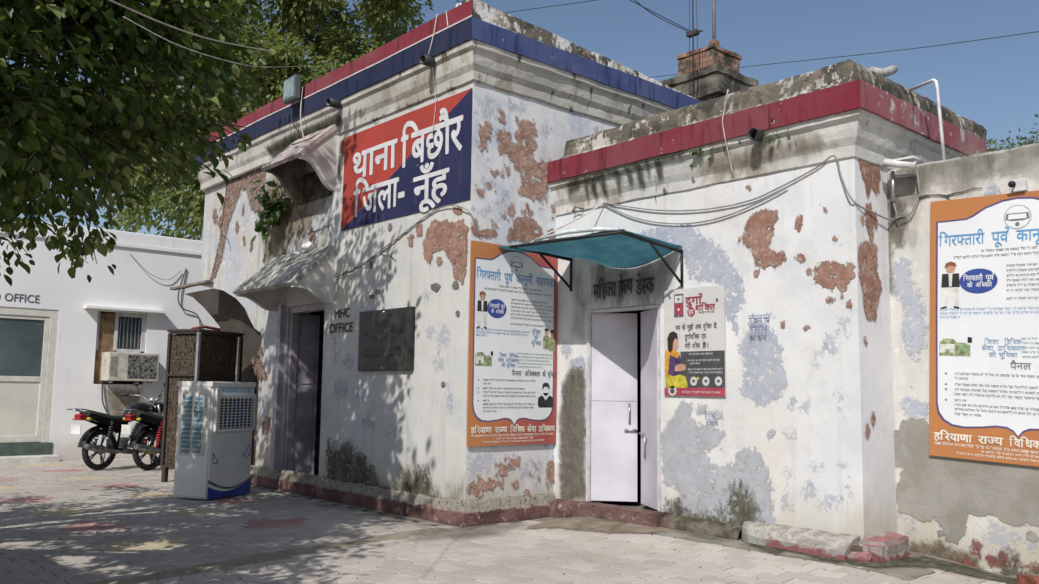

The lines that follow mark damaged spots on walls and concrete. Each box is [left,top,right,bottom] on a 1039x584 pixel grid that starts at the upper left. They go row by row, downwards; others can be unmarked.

peeling [210,169,266,280]
peeling [407,109,556,292]
peeling [640,159,929,410]
damp [326,439,434,497]
peeling [466,453,555,498]
damp [559,362,586,500]
peeling [660,399,776,524]
damp [910,540,977,567]